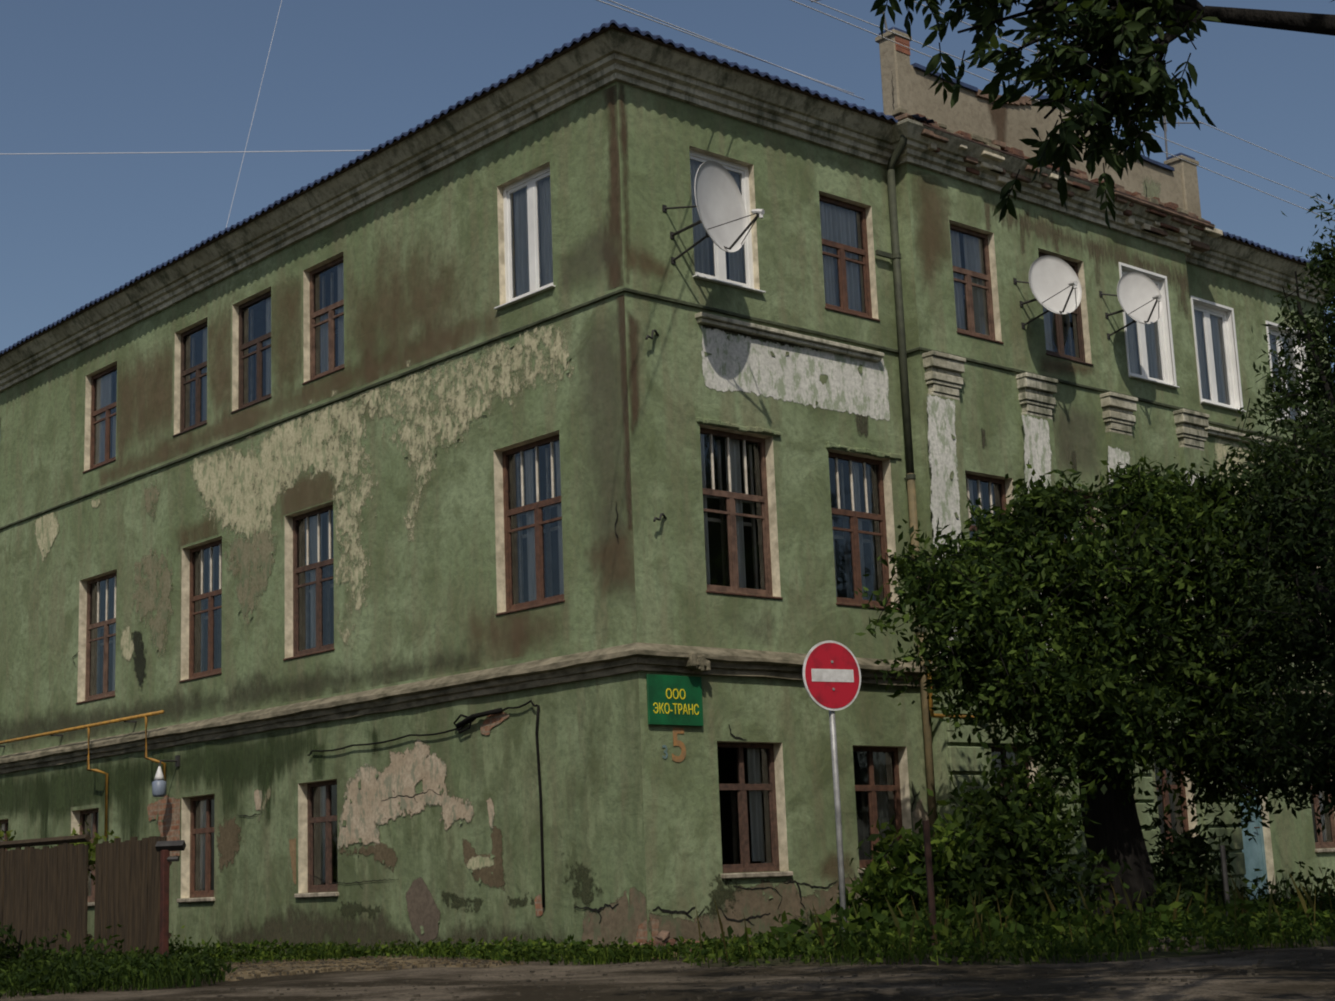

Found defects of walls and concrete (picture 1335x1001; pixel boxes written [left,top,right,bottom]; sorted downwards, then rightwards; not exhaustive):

flaking render [892,107,1223,253]
peeling [701,326,890,421]
peeling [190,324,574,645]
peeling [927,394,961,564]
peeling [1022,414,1052,493]
peeling [1107,446,1130,489]
peeling [34,512,59,561]
flaking render [147,795,180,857]
peeling [337,739,505,890]
crack [574,903,619,924]
crack [652,873,867,928]